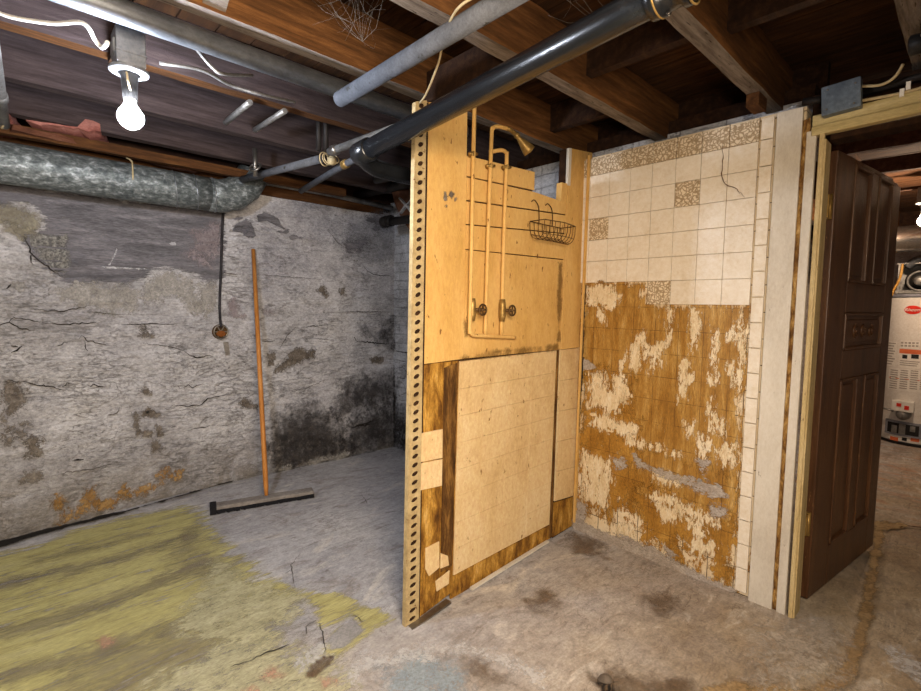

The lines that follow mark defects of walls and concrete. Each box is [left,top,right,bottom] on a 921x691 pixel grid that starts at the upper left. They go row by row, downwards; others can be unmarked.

crack [0,305,211,358]
damp [375,319,396,350]
peeling [586,284,623,327]
crack [5,380,104,391]
crack [166,384,230,429]
damp [268,372,406,469]
peeling [576,307,750,558]
corrosion [49,466,185,526]